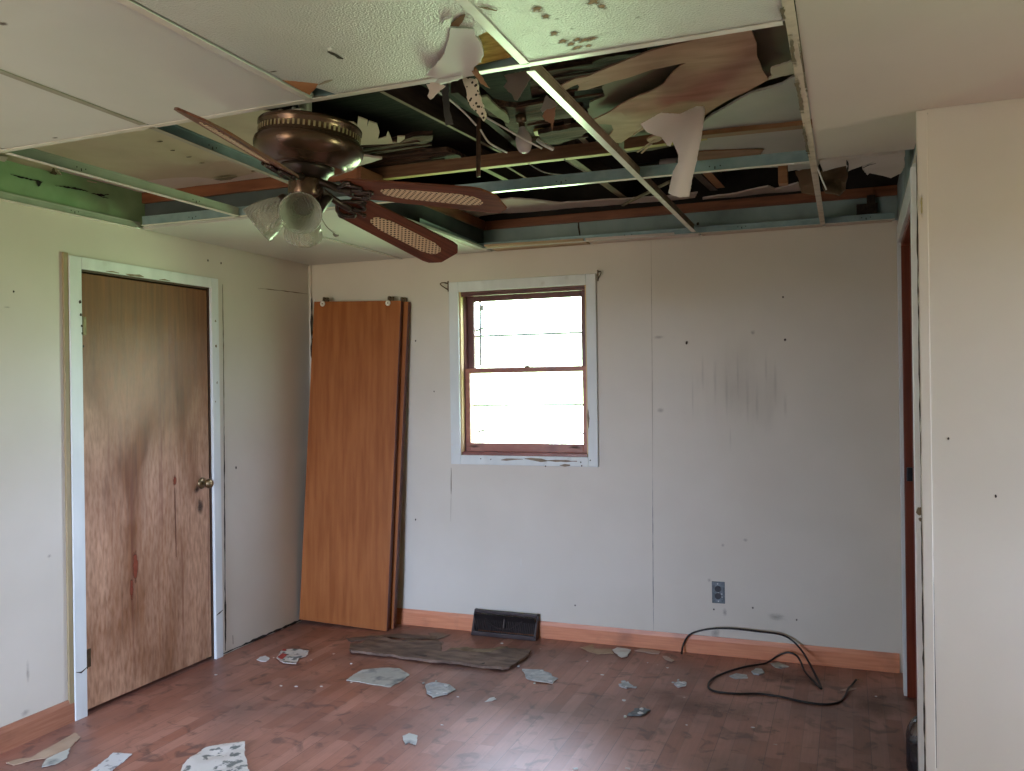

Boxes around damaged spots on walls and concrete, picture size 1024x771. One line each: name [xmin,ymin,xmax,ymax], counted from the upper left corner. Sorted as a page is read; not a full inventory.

spalling [283,79,333,97]
peeling [349,116,405,145]
peeling [0,110,269,181]
peeling [480,458,591,467]